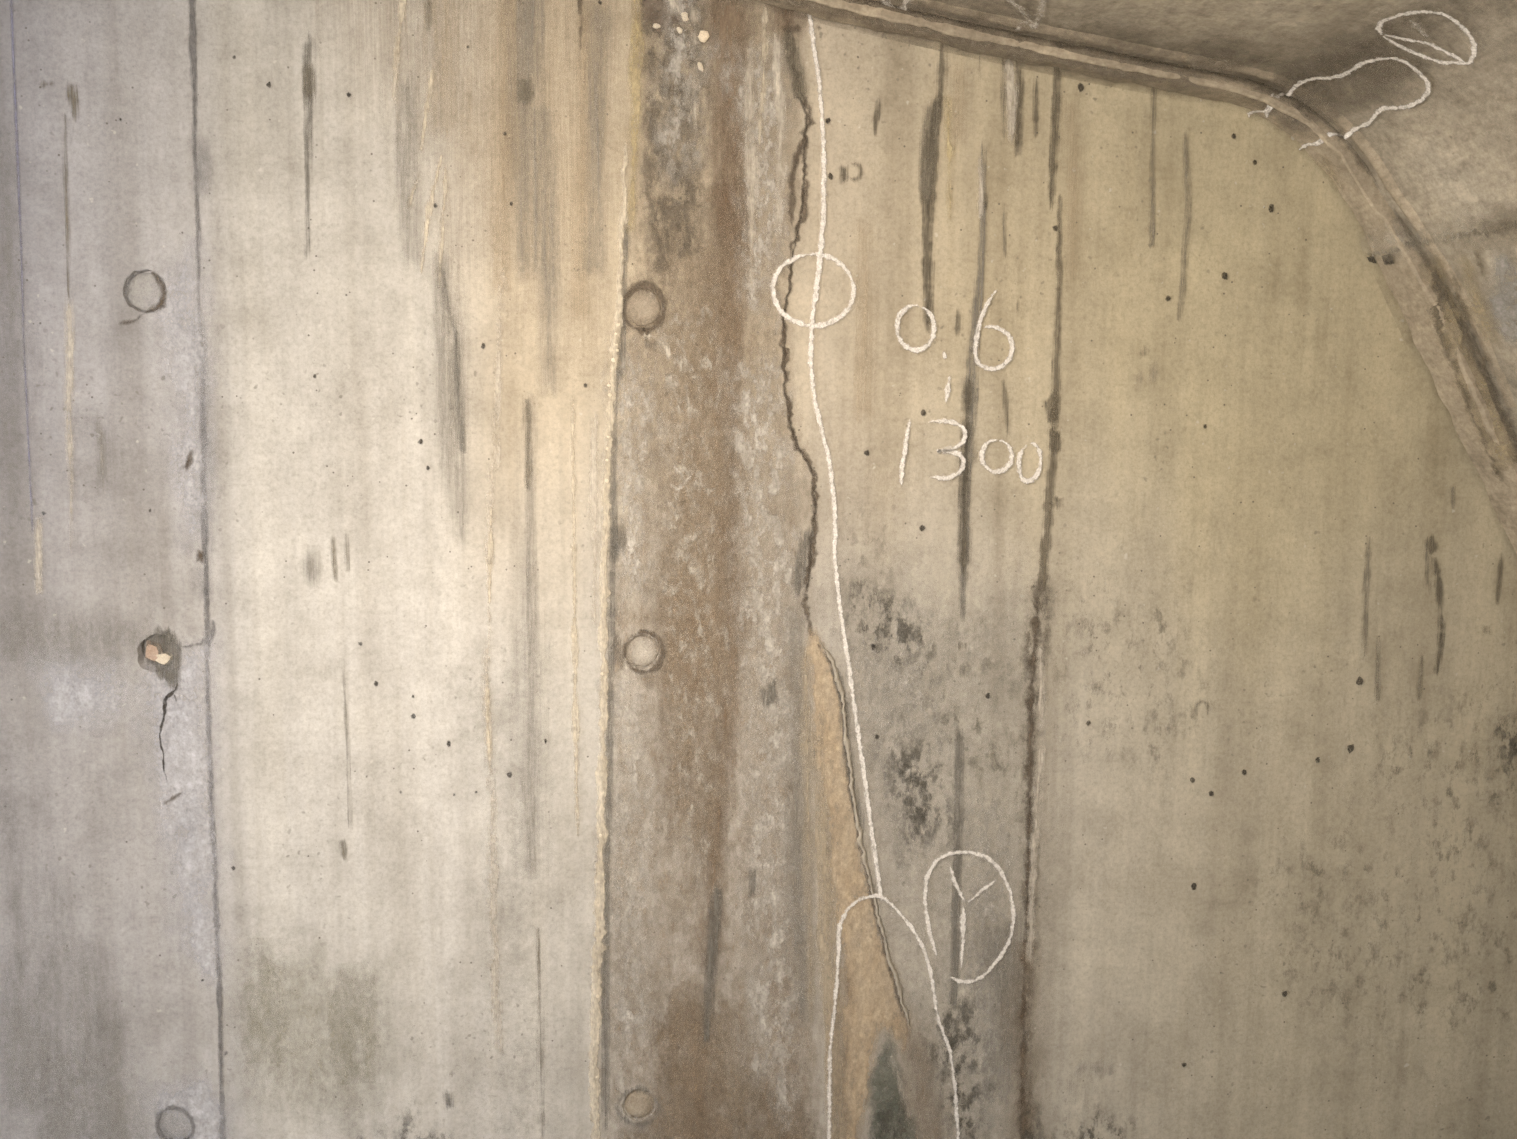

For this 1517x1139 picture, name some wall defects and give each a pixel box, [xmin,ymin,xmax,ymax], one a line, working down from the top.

leakage [303,42,315,207]
leakage [393,0,434,146]
leakage [160,276,203,416]
leakage [407,155,465,450]
crack [777,8,819,638]
leakage [178,437,202,516]
leakage [849,0,1244,1139]
leakage [49,664,116,722]
spalling [142,628,179,688]
crack [159,686,177,803]
leakage [151,659,215,974]
leakage [161,1083,219,1139]